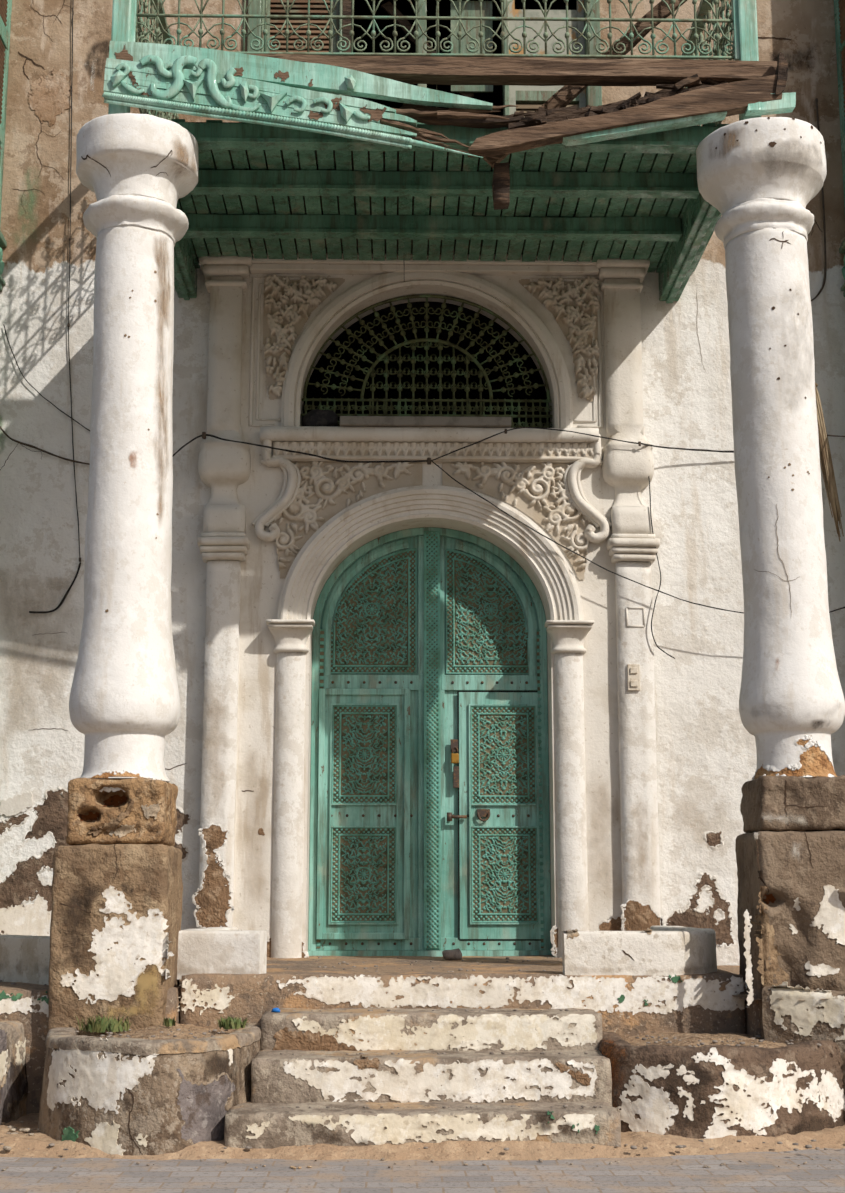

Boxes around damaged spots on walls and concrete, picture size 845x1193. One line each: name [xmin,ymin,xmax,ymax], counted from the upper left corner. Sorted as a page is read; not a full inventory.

crack [18,0,74,79]
water stain [86,42,109,81]
crack [18,121,111,208]
crack [756,504,798,613]
flaking render [752,735,838,780]
flaking render [0,770,162,936]
flaking render [174,806,243,930]
peeling [0,990,49,1017]
peeling [60,886,235,1015]
peeling [273,871,845,1145]
peeling [47,1038,159,1156]
flaking render [175,1049,235,1146]